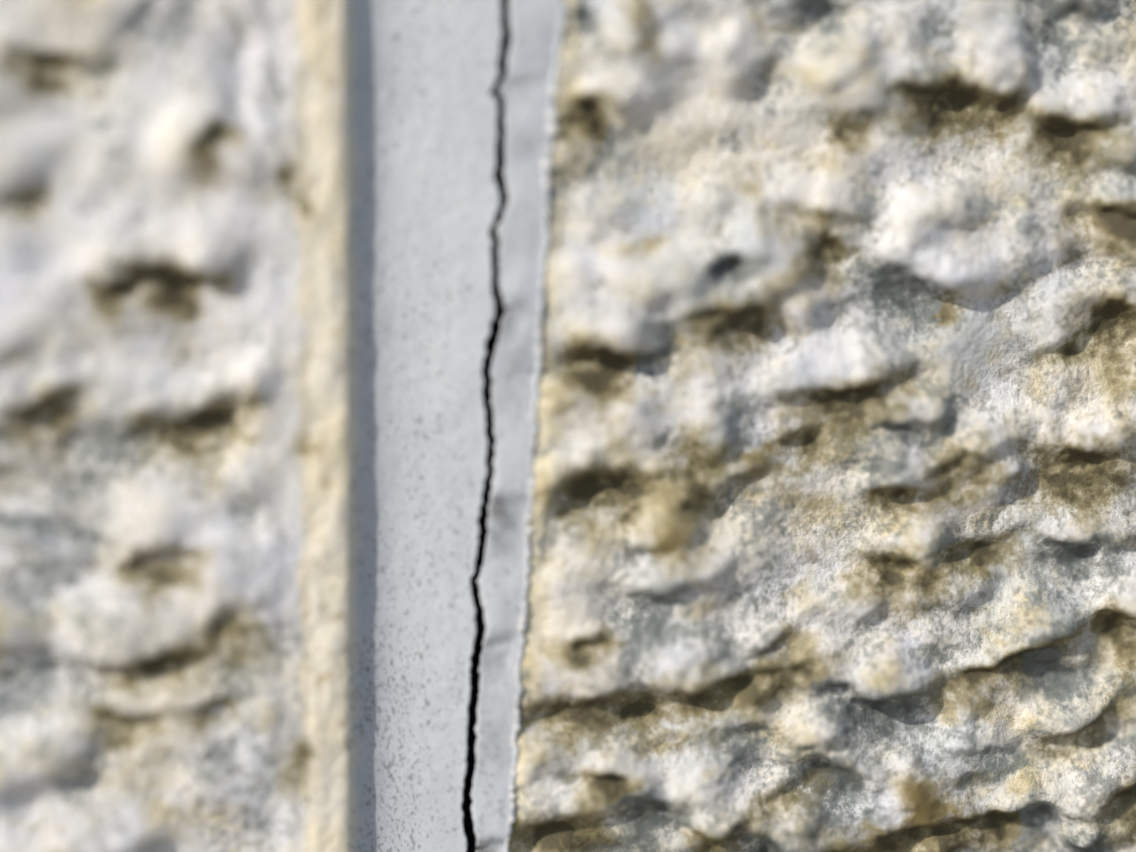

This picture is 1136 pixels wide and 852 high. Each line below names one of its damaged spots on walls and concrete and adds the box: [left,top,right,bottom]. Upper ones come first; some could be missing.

crack [462,0,513,852]